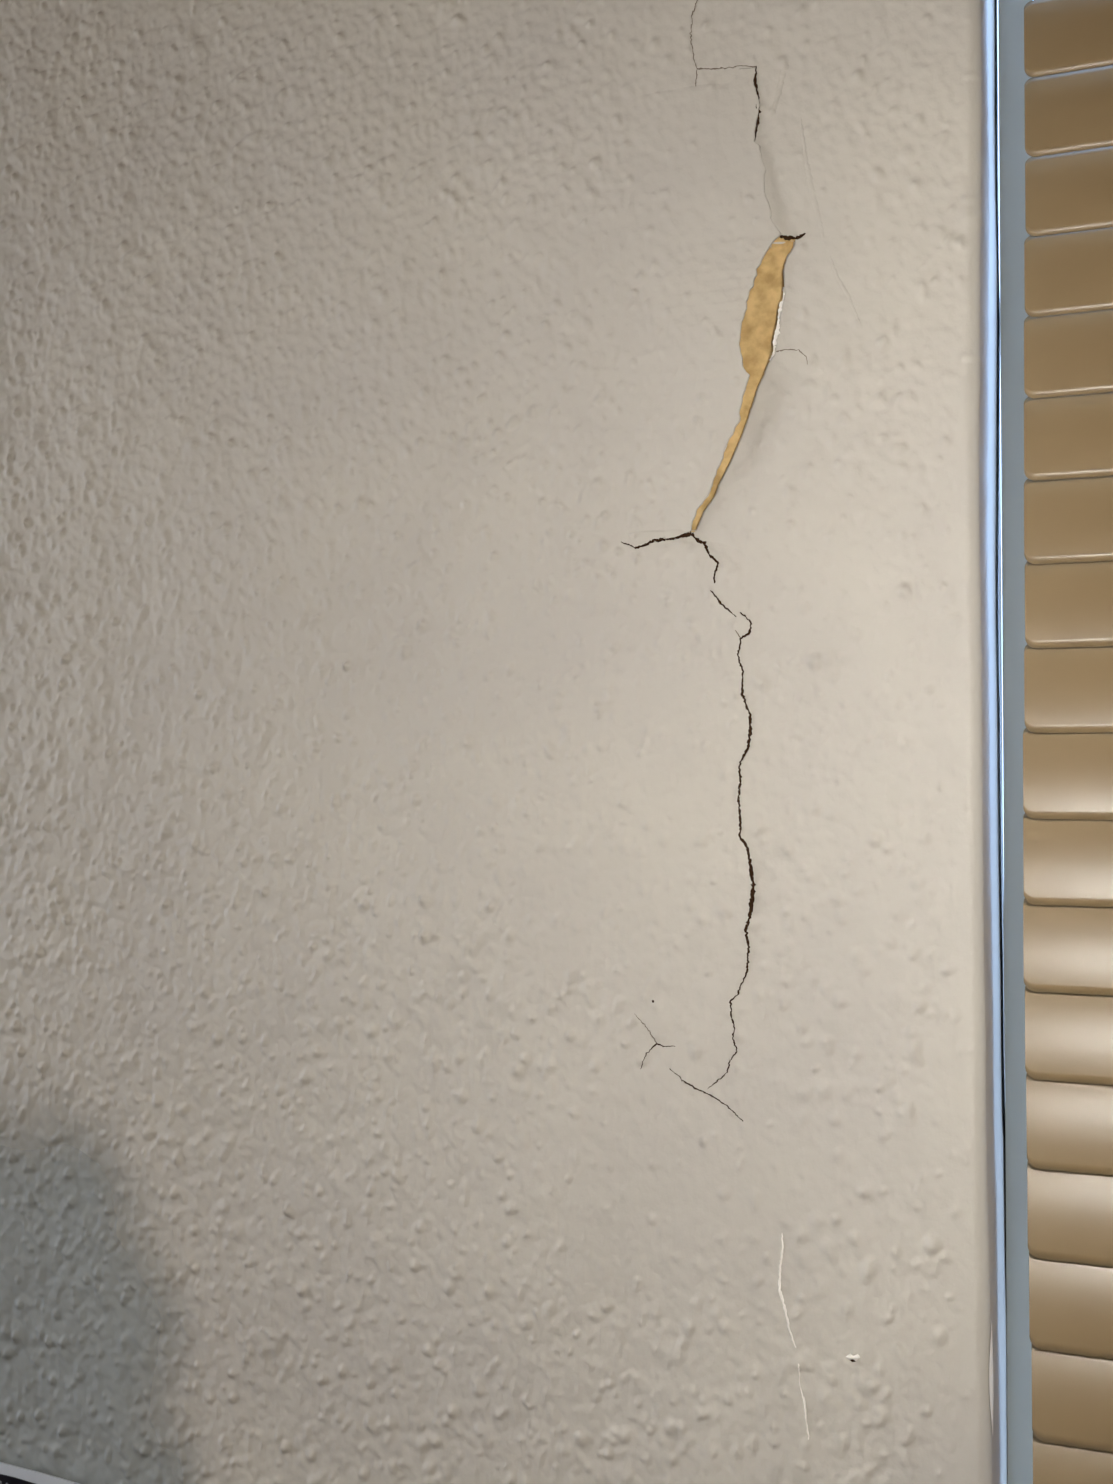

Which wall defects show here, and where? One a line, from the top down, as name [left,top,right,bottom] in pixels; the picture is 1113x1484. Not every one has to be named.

crack [689,0,761,138]
crack [780,233,806,241]
crack [622,531,756,1122]